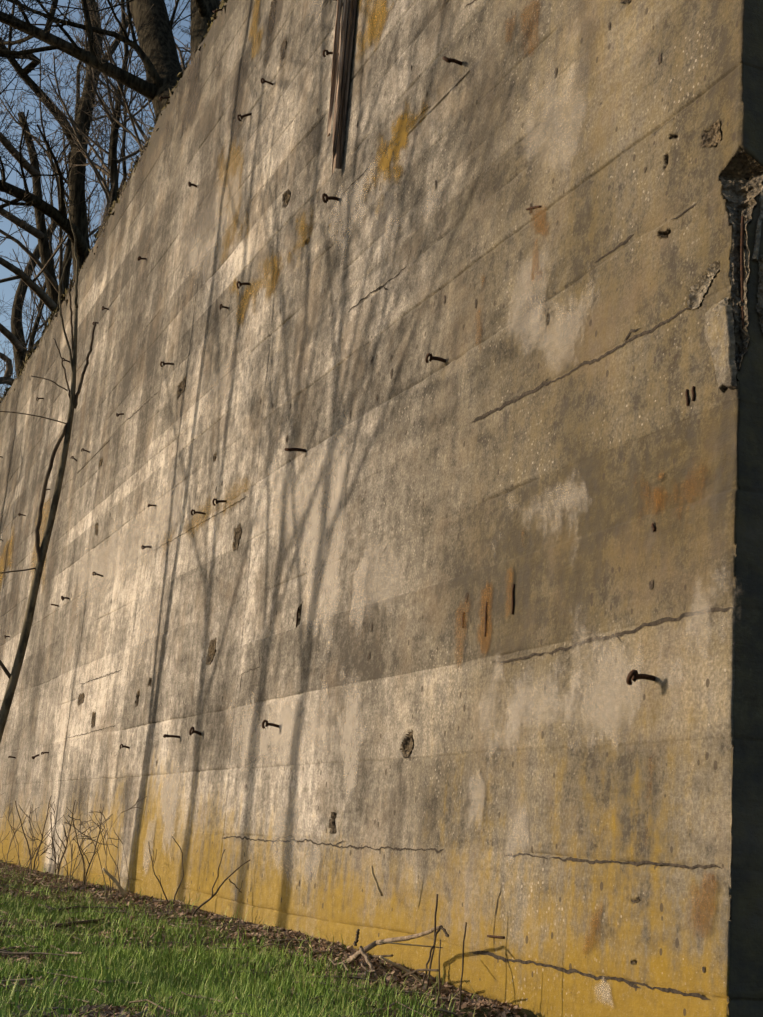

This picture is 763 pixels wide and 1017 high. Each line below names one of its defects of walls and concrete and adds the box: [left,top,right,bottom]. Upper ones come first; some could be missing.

spalling [687,150,763,393]
crack [492,607,734,664]
spalling [400,730,414,757]
crack [223,835,443,853]
crack [504,852,722,869]
crack [472,888,710,1000]